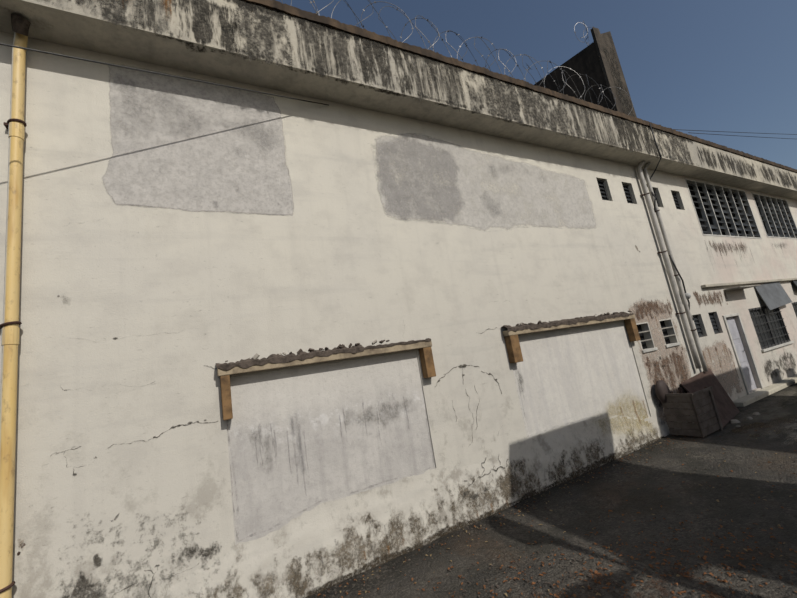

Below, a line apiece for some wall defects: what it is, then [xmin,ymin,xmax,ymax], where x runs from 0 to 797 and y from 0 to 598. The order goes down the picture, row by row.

damp [69,0,797,189]
damp [377,140,461,220]
crack [435,364,502,440]
peeling [502,300,691,423]
peeling [703,341,742,396]
damp [253,403,664,598]
crack [464,456,508,499]
damp [63,567,150,598]
damp [173,544,222,567]
damp [208,574,245,598]